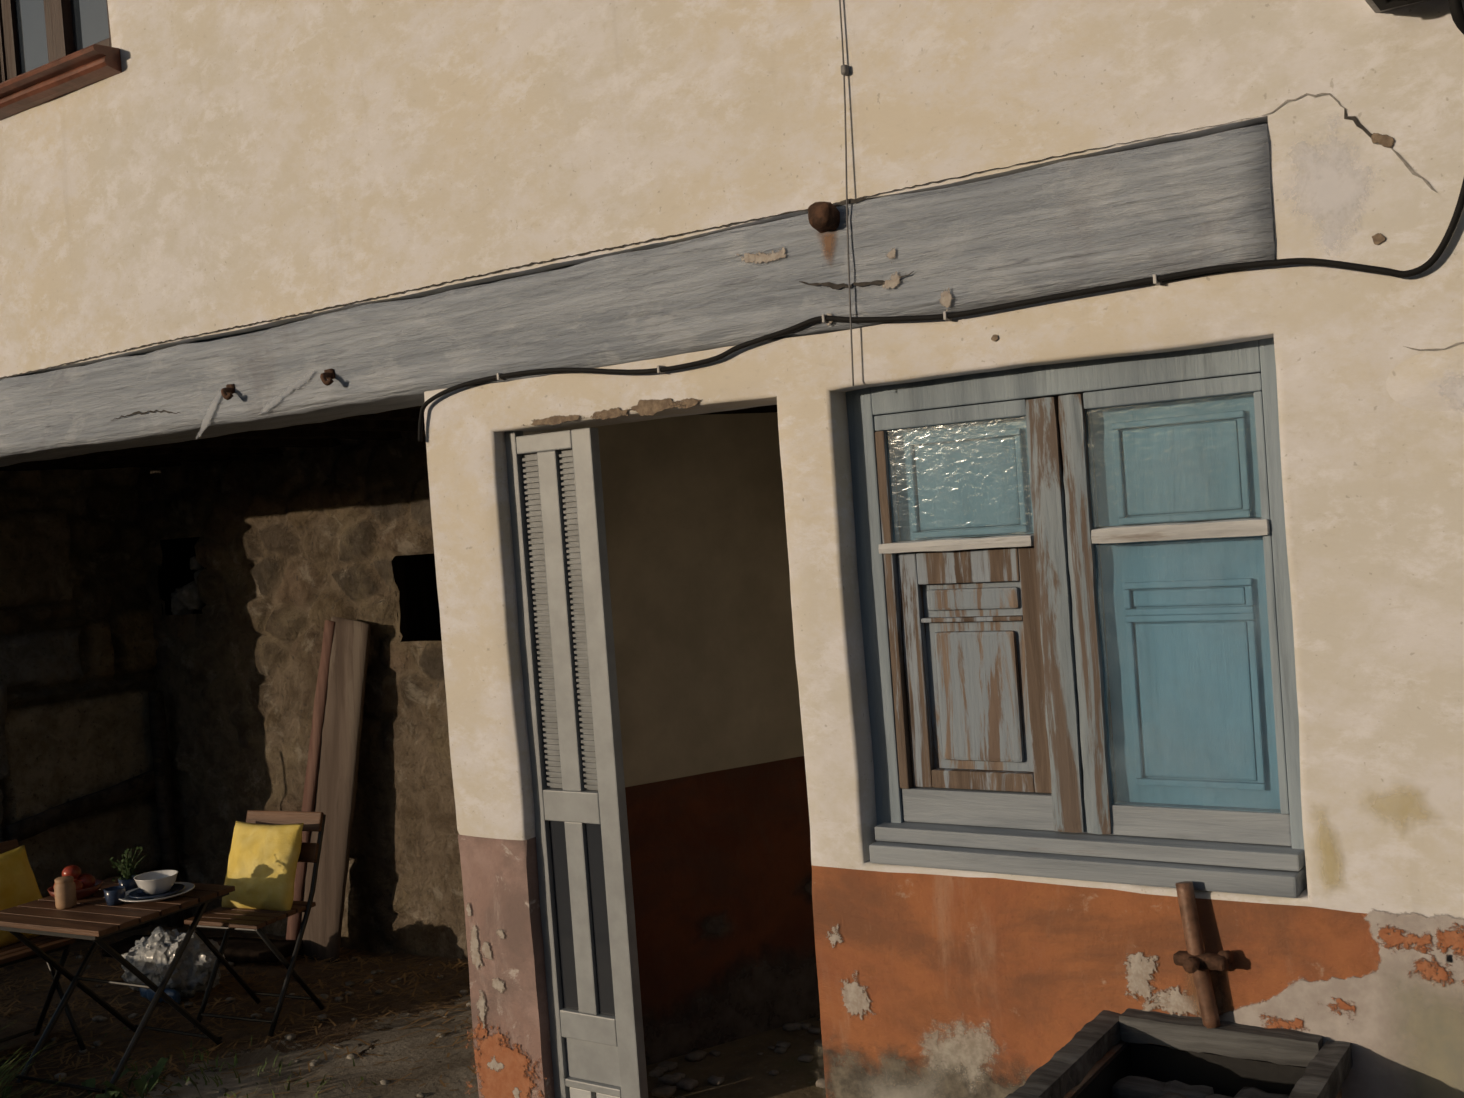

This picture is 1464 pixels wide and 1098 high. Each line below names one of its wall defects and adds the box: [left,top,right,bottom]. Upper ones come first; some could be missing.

crack [0,93,1436,379]
spalling [523,398,701,426]
peeling [465,903,546,1098]
peeling [839,972,876,1020]
peeling [1123,952,1201,1017]
peeling [1219,909,1464,1098]
water stain [820,1022,1026,1098]